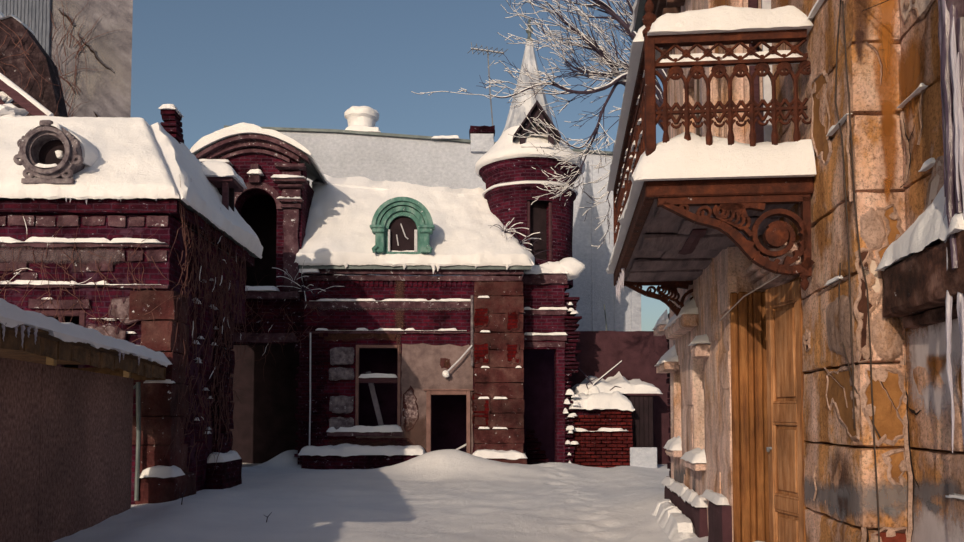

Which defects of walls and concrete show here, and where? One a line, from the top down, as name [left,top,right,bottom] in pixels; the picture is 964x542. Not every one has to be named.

crack [58,8,115,73]
water stain [855,0,869,60]
flaking render [826,204,907,488]
spalling [402,385,419,432]
crack [824,367,848,408]
crack [873,352,922,542]
crack [811,465,819,501]